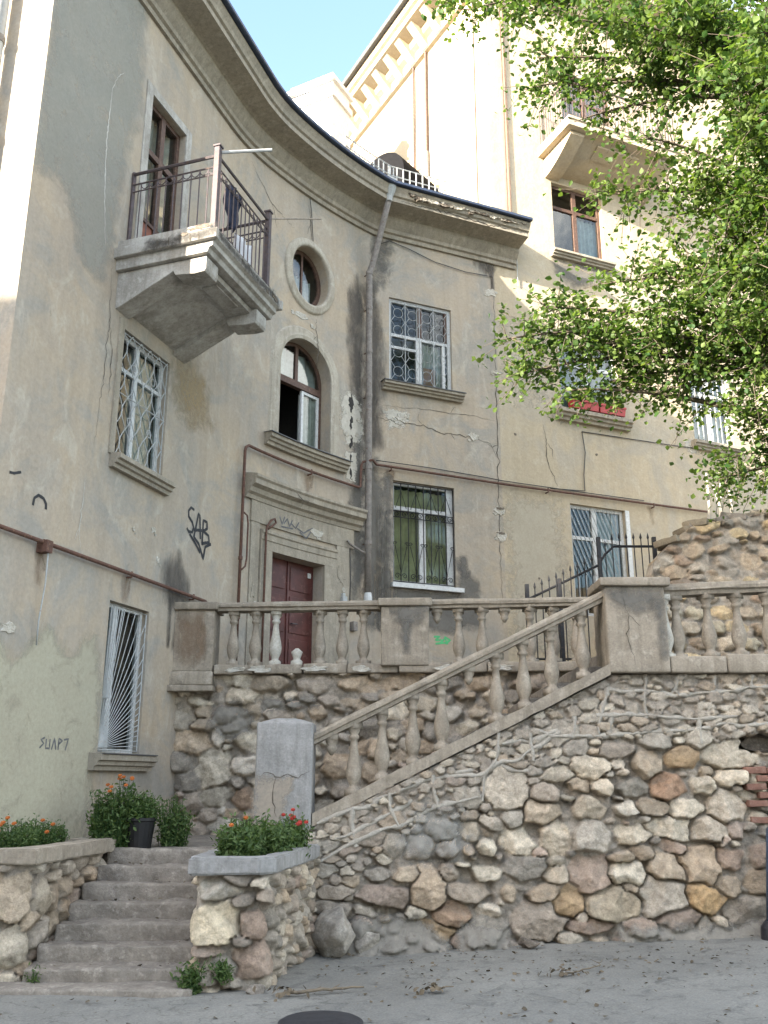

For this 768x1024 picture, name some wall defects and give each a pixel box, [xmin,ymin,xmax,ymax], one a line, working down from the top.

crack [104,73,124,206]
crack [94,299,113,440]
flaking render [339,391,364,483]
damp [349,236,479,650]
crack [375,265,503,597]
damp [166,559,188,646]
crack [255,770,311,815]